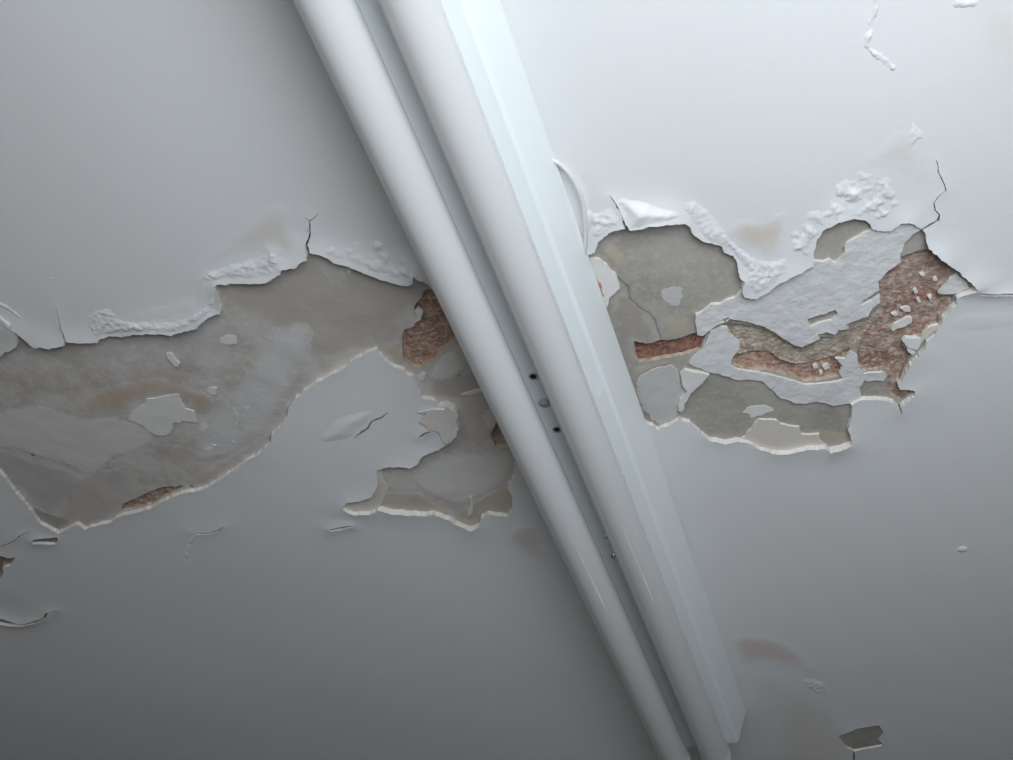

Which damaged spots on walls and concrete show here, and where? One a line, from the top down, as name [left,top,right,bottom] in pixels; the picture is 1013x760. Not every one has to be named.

crack [921,160,946,230]
flaking render [588,219,973,451]
flaking render [0,252,516,542]
flaking render [0,556,14,577]
spalling [839,725,883,749]